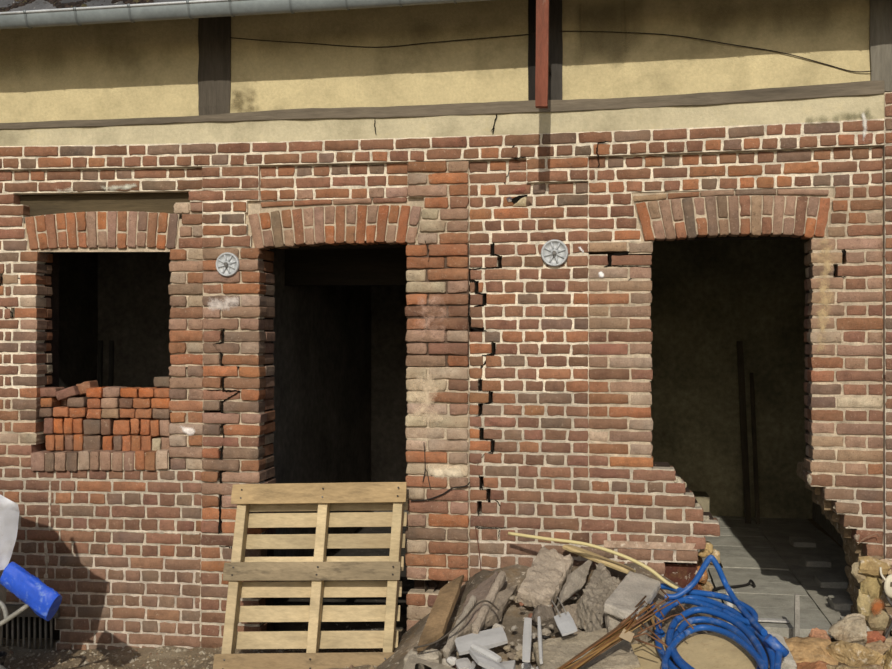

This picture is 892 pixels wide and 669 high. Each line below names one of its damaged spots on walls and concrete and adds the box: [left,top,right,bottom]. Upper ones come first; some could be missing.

crack [468,243,507,538]
spalling [604,540,720,592]
spalling [797,462,892,636]